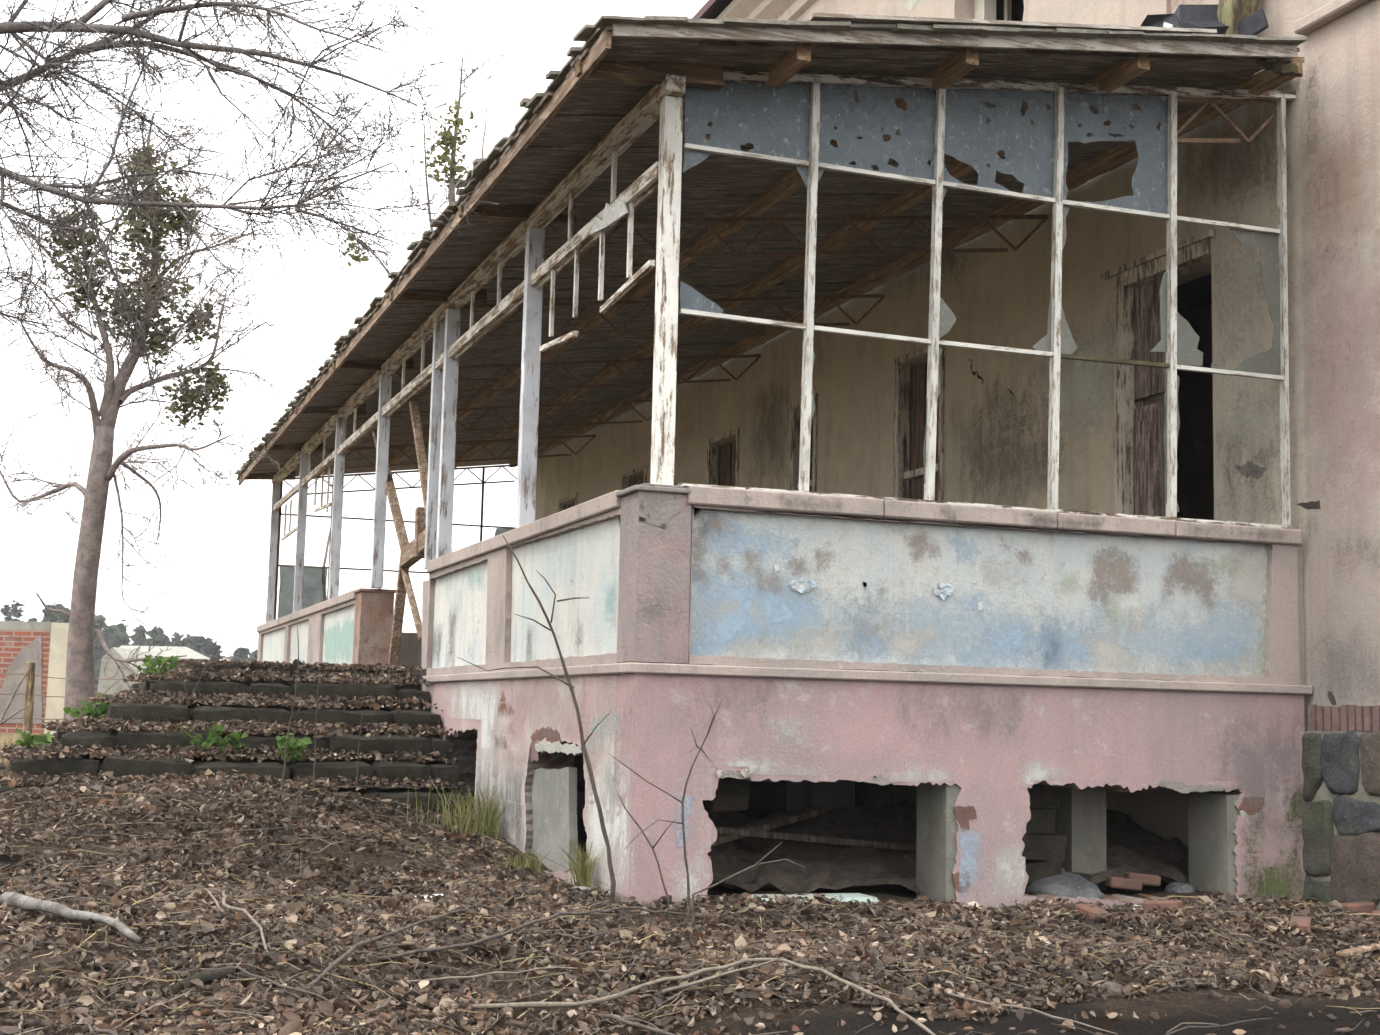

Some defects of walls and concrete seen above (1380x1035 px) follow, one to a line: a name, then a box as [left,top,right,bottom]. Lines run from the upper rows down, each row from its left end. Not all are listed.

peeling [746,552,827,594]
spalling [531,729,582,763]
spalling [710,758,780,794]
peeling [676,854,706,904]